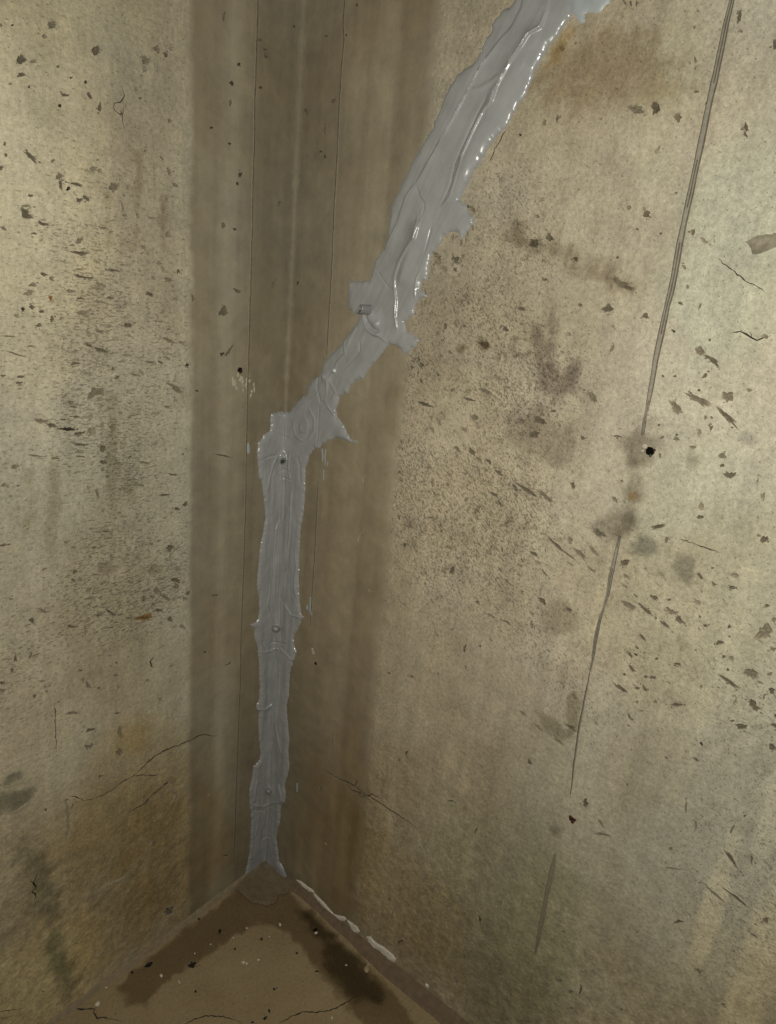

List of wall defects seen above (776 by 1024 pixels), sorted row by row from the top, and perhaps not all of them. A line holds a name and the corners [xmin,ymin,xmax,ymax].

crack [71,734,211,813]
crack [324,769,424,839]
water stain [296,879,396,962]